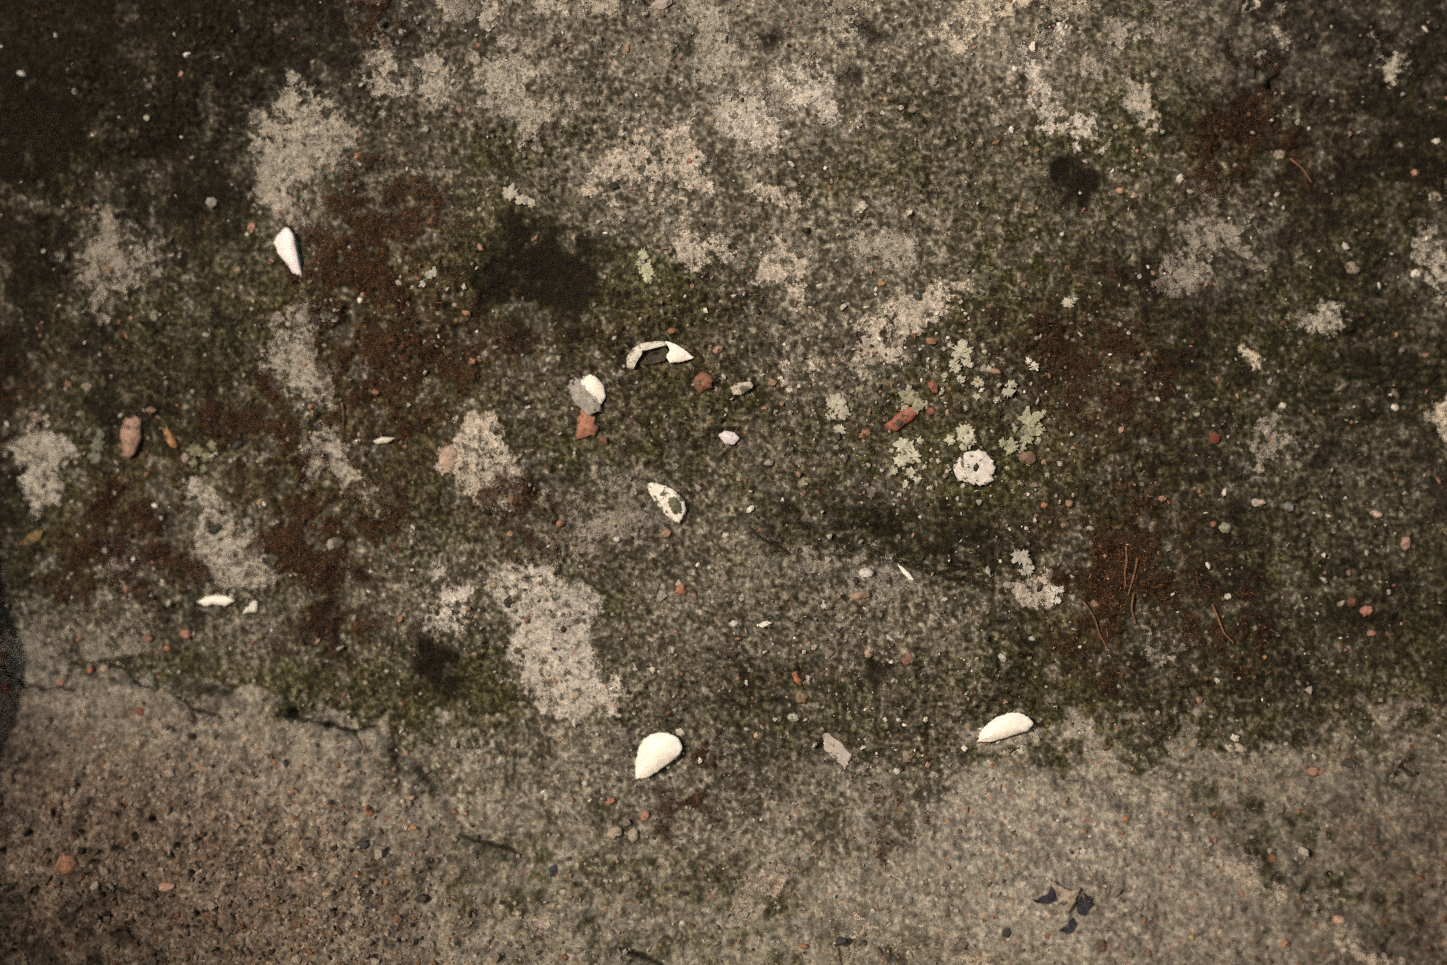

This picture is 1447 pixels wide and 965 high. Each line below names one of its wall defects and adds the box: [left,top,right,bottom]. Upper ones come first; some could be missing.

damp [859,20,882,46]
damp [0,43,82,193]
damp [463,203,630,353]
damp [667,496,682,514]
damp [404,623,460,698]